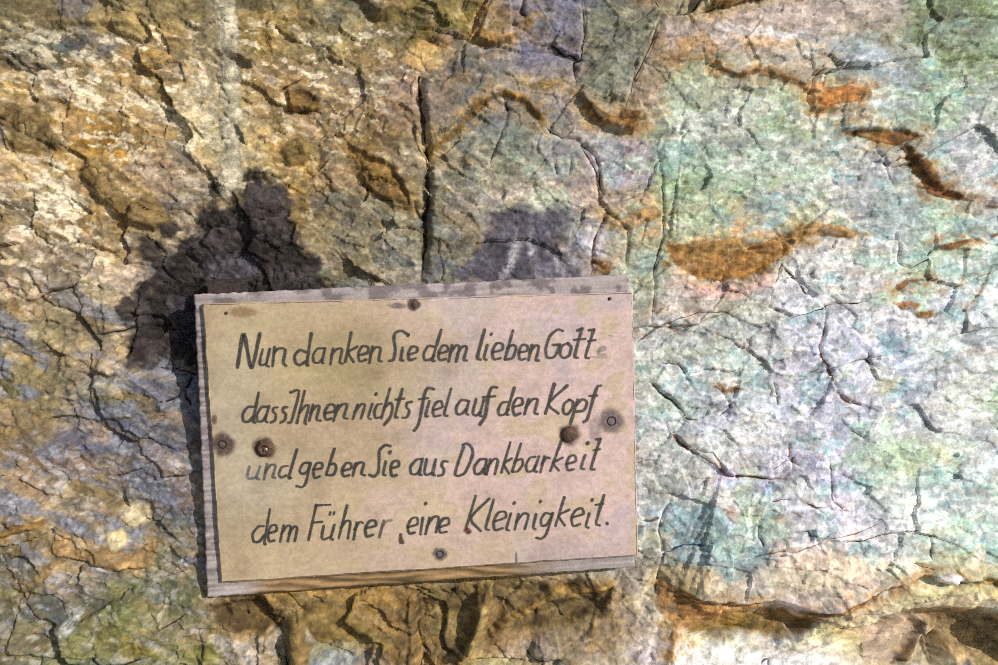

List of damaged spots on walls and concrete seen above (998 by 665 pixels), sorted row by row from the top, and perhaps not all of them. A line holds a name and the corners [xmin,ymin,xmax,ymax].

crack [626,2,659,106]
crack [684,0,760,15]
crack [362,76,430,282]
water stain [452,204,581,282]
crack [547,128,629,269]
crack [639,146,739,341]
crack [769,263,865,406]
crack [652,362,845,511]
crack [756,525,934,570]